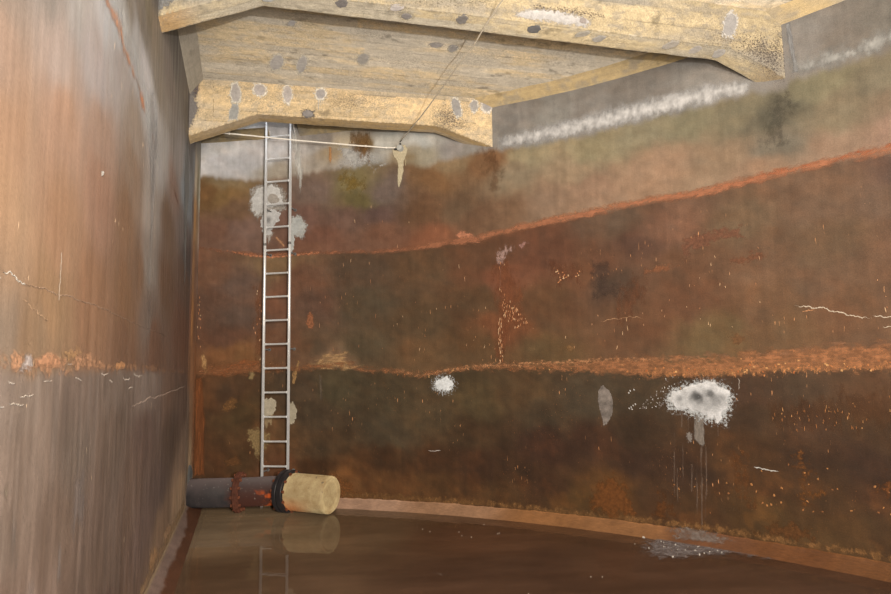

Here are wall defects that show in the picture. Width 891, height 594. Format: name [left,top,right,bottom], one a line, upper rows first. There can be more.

water stain [735,26,785,83]
water stain [797,33,891,71]
water stain [501,82,748,146]
rust [350,132,370,162]
water stain [340,145,408,187]
rust [351,144,891,253]
crack [0,271,163,335]
crack [795,305,891,328]
crack [0,380,52,408]
crack [102,373,184,406]
rust [4,344,891,475]